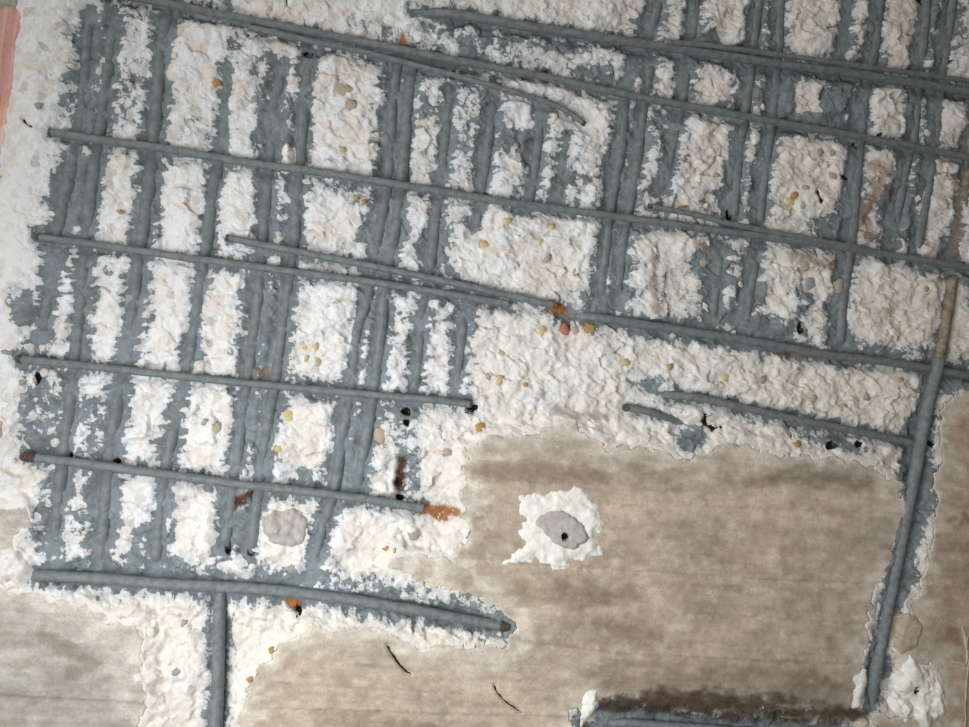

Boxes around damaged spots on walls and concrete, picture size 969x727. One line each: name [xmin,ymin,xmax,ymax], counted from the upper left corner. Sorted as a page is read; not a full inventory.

spalling [129,0,969,264]
spalling [35,127,969,392]
rust [548,300,568,317]
spalling [19,451,425,513]
spalling [15,355,472,491]
rust [416,505,460,521]
spalling [854,277,969,727]
spalling [133,602,213,727]
spalling [210,592,227,727]
spalling [223,605,278,727]
spalling [34,570,511,632]
leakage [600,688,867,724]